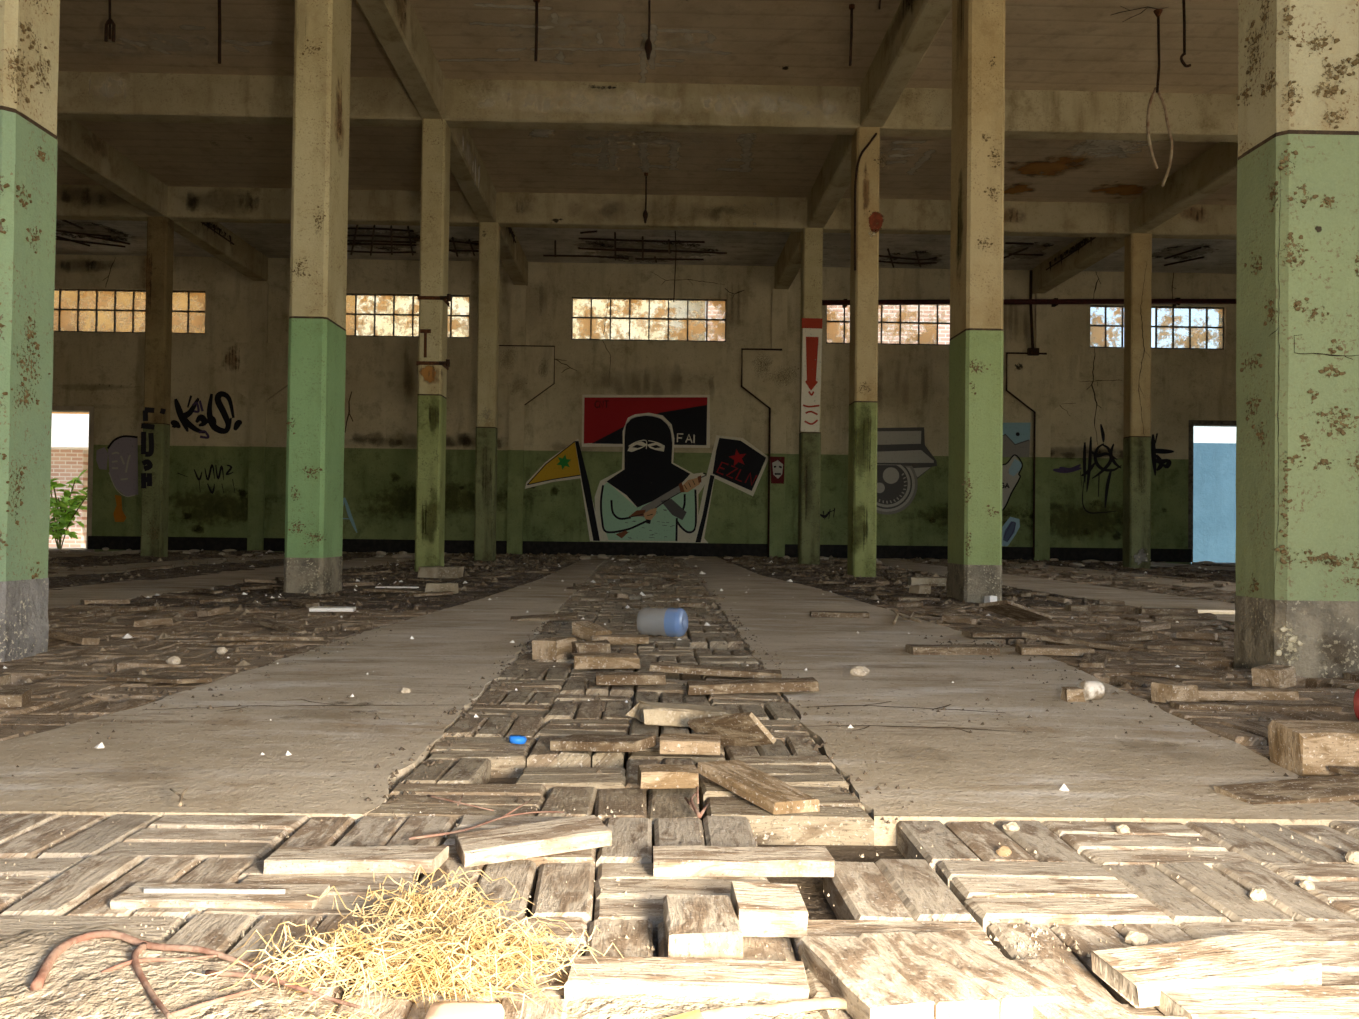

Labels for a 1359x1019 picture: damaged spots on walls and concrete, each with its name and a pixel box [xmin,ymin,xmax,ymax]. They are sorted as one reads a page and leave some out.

corrosion [1004,157,1086,194]
spalling [25,220,130,254]
spalling [347,225,416,256]
spalling [977,236,1096,271]
crack [1269,165,1359,592]
damp [429,407,439,430]
damp [854,419,871,469]